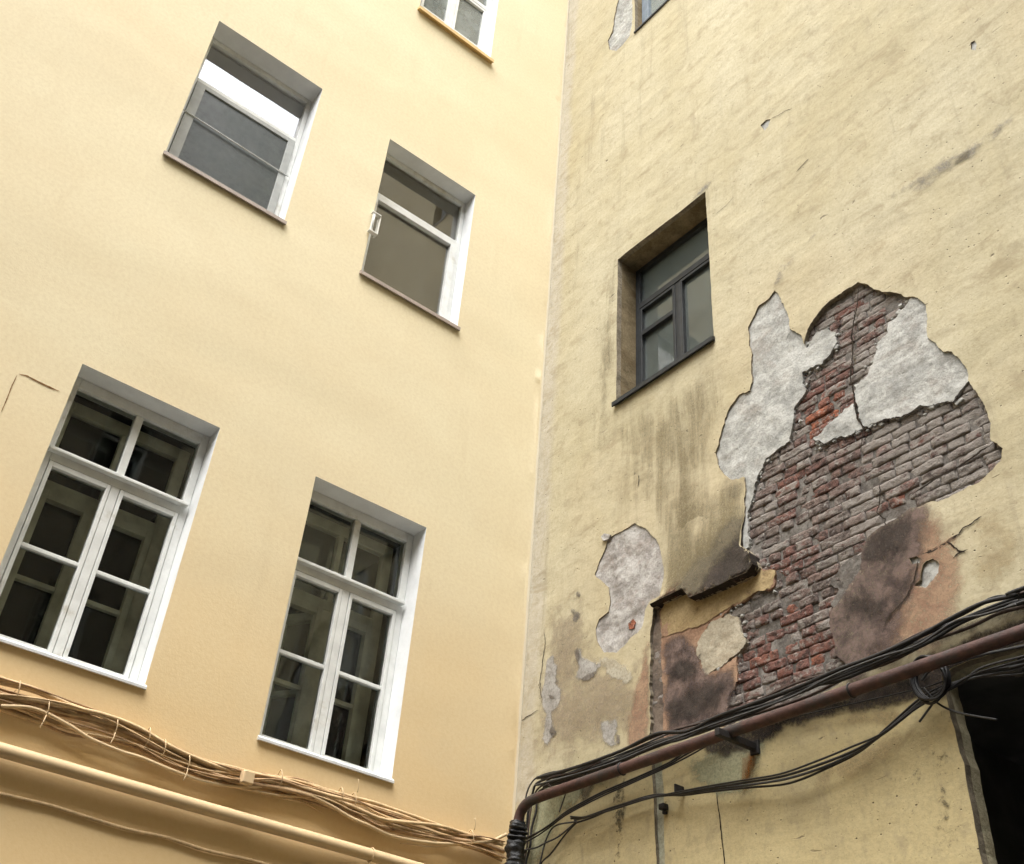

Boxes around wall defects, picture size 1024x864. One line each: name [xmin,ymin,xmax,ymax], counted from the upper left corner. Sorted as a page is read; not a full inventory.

flaking render [608,0,633,51]
crack [1,374,58,412]
leakage [657,389,758,600]
flaking render [575,285,1003,738]
leakage [850,517,959,651]
crack [883,516,981,628]
peeling [541,655,561,743]
leakage [667,660,726,725]